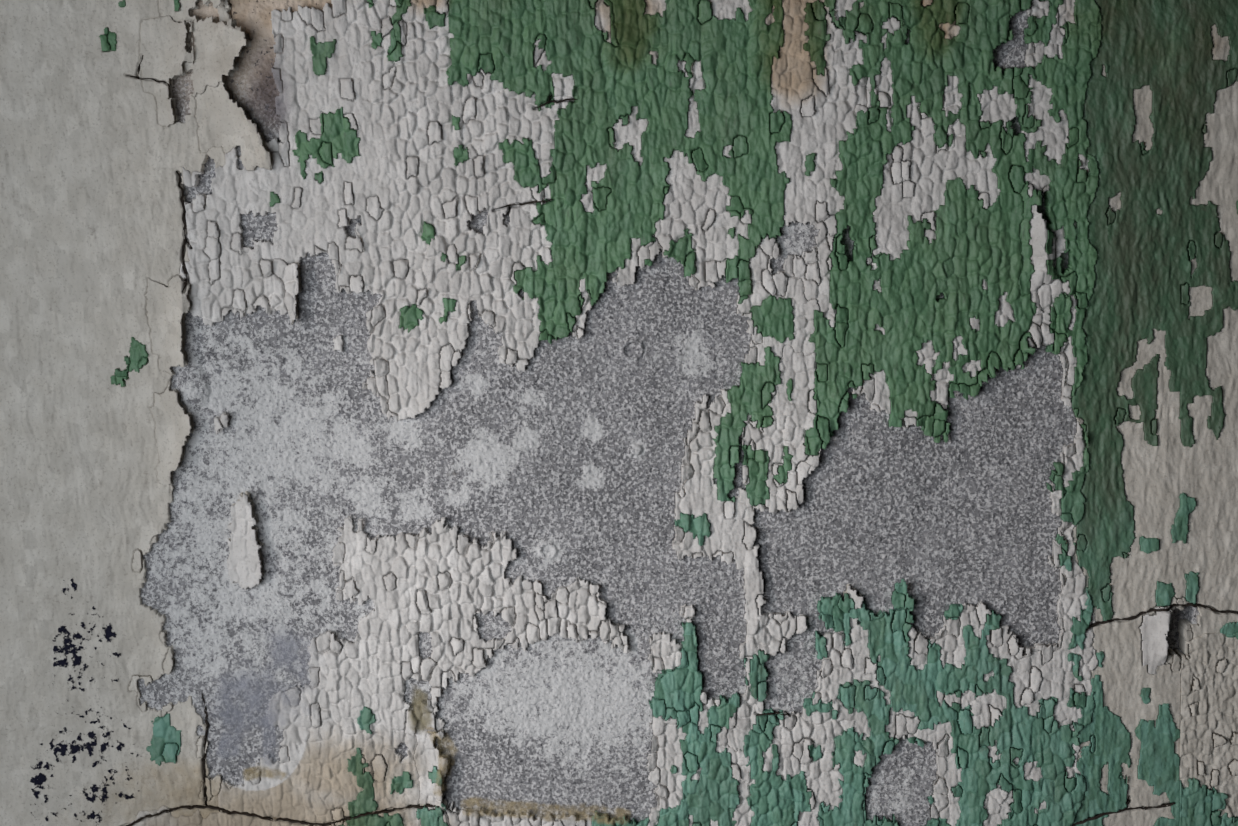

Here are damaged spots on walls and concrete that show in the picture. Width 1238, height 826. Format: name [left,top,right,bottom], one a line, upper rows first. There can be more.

peeling [99,28,110,51]
peeling [114,356,147,387]
spalling [129,0,868,826]
crack [1086,603,1238,631]
crack [126,693,438,826]